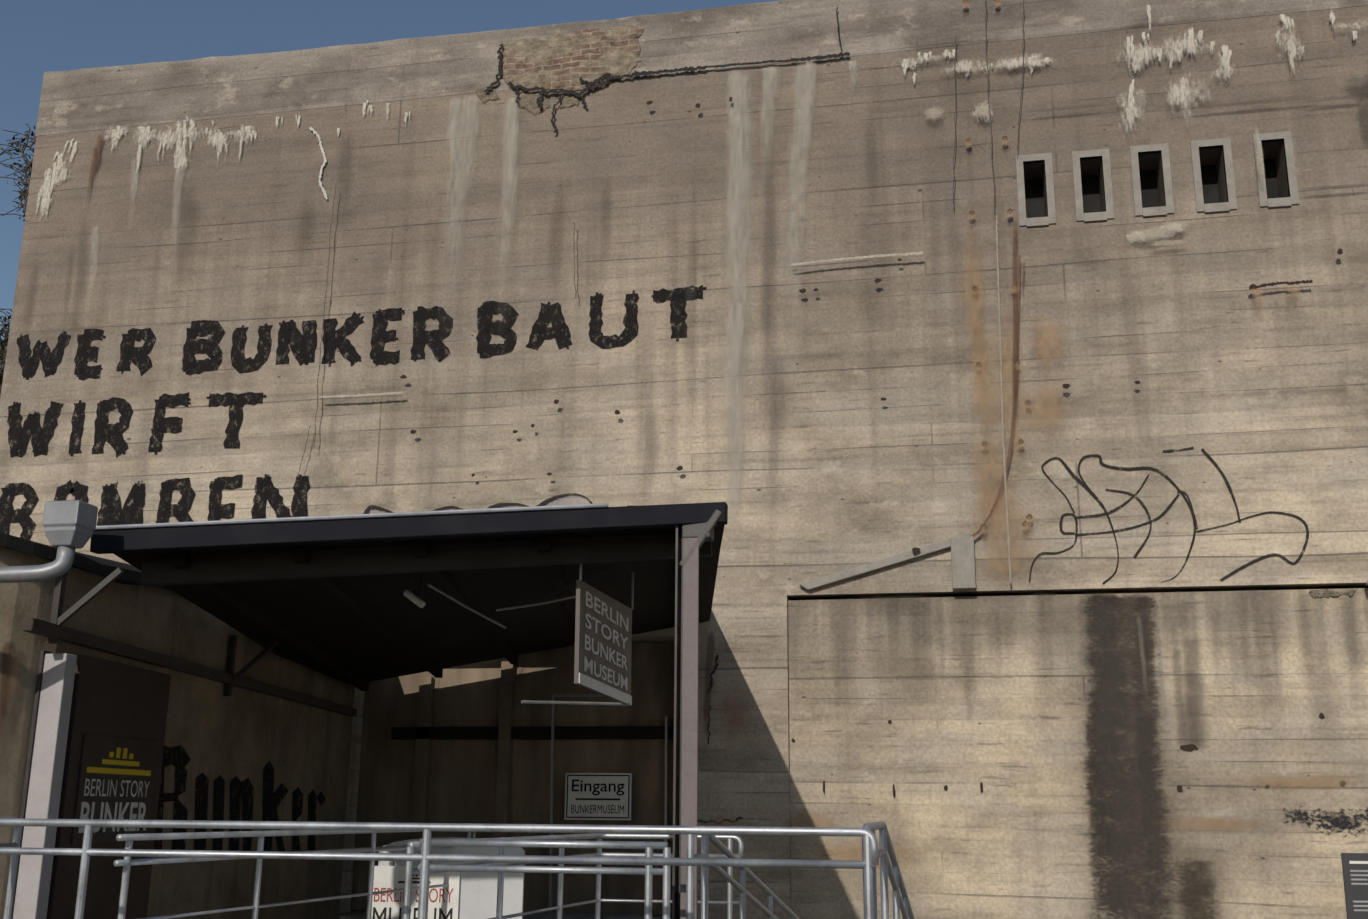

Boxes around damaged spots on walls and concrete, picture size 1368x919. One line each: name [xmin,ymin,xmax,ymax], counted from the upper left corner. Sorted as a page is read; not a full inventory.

leakage [36,139,77,214]
leakage [106,116,257,176]
leakage [276,115,328,199]
leakage [363,100,410,122]
spalling [475,25,644,116]
leakage [901,49,1050,83]
leakage [1122,5,1293,127]
leakage [1276,14,1304,68]
corrosion [972,225,1025,537]
leakage [1088,595,1213,919]